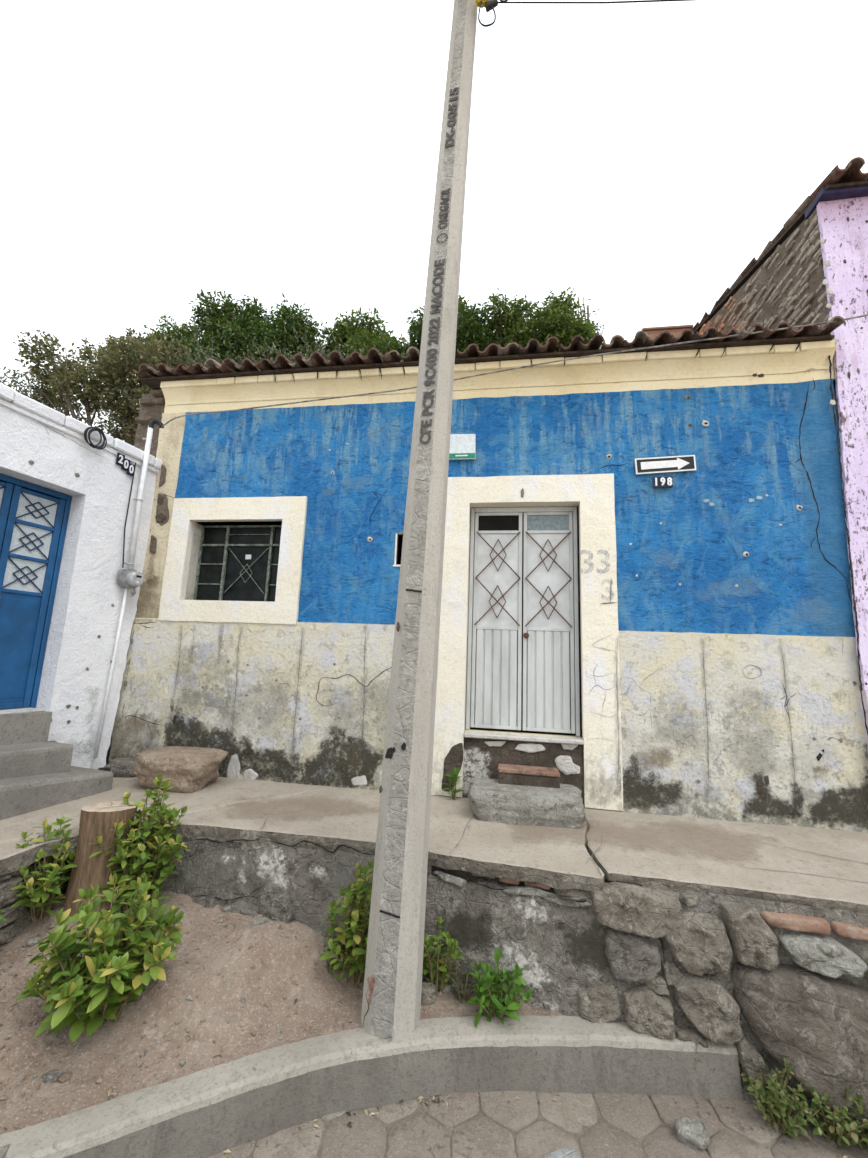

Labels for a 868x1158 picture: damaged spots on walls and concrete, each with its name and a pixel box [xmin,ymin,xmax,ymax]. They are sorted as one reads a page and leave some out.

crack [795,355,868,734]
damp [163,707,383,788]
damp [620,755,682,809]
damp [742,773,868,829]
crack [433,816,542,894]